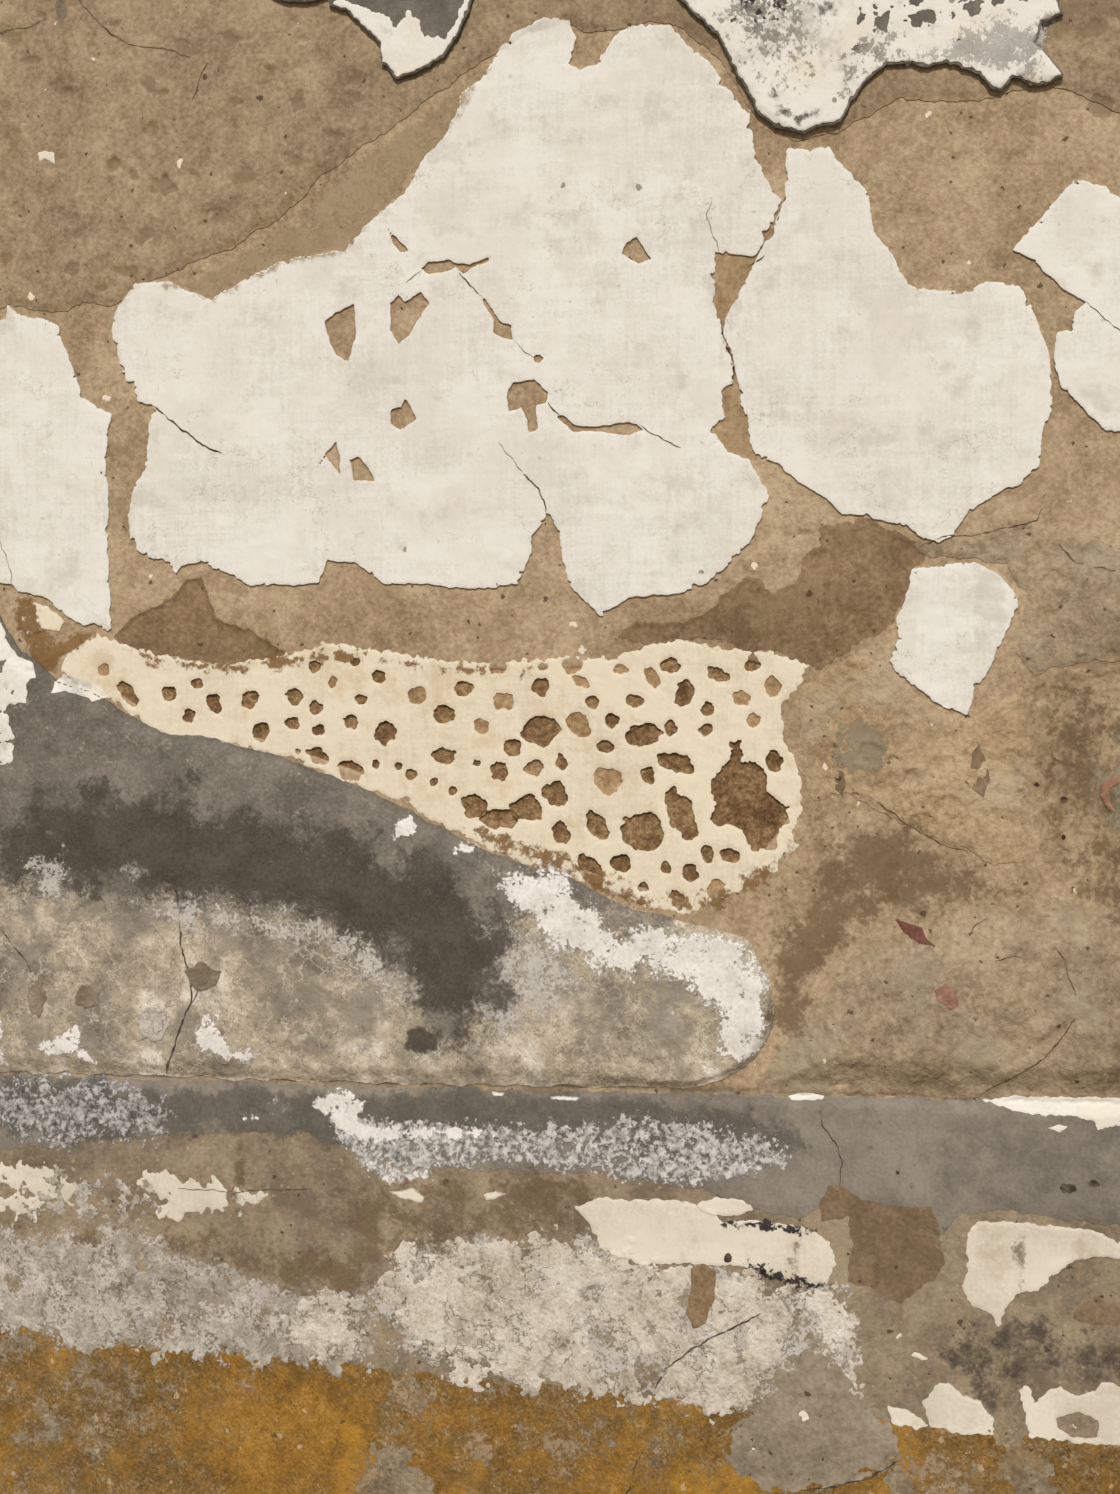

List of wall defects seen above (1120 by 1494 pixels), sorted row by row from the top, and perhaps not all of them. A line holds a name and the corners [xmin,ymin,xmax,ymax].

peeling [333,0,470,77]
peeling [685,0,1061,131]
peeling [0,602,64,765]
flaking render [614,516,1120,866]
crack [166,888,207,1074]
damp [0,771,1022,1068]
damp [0,1010,817,1384]
peeling [0,1160,945,1494]
damp [574,1285,668,1417]
damp [691,1258,862,1413]
peeling [962,1221,1120,1327]
peeling [883,1382,1120,1494]